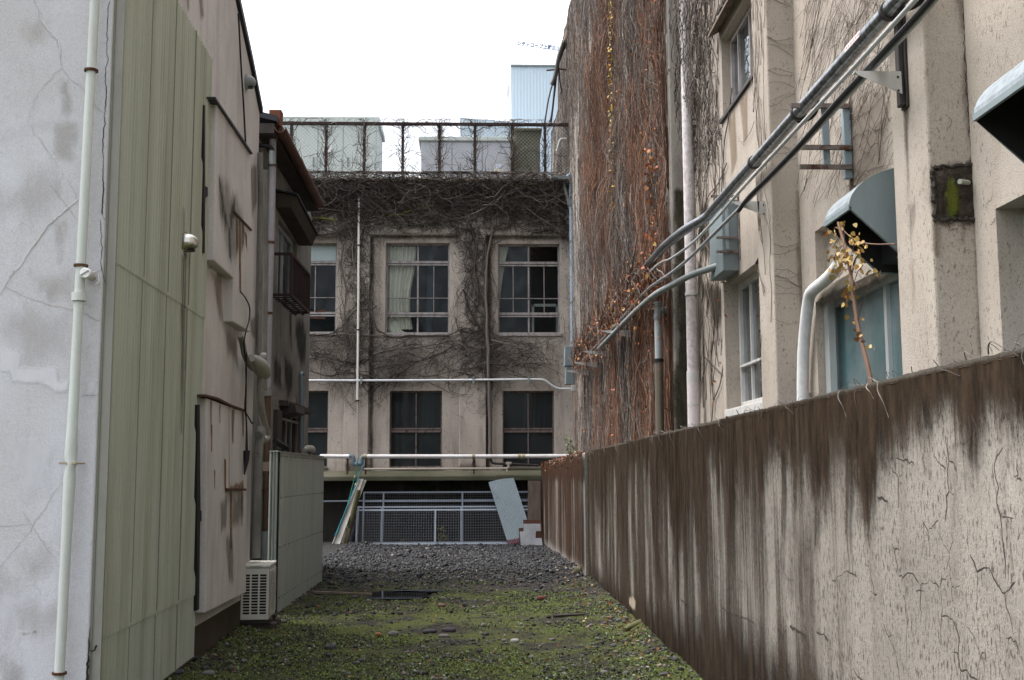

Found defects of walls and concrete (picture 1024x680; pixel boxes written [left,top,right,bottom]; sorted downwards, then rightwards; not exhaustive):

crack [22,0,111,284]
damp [219,180,244,258]
damp [930,165,974,255]
corrosion [214,459,244,547]
damp [588,188,1024,680]
crack [877,414,1022,680]